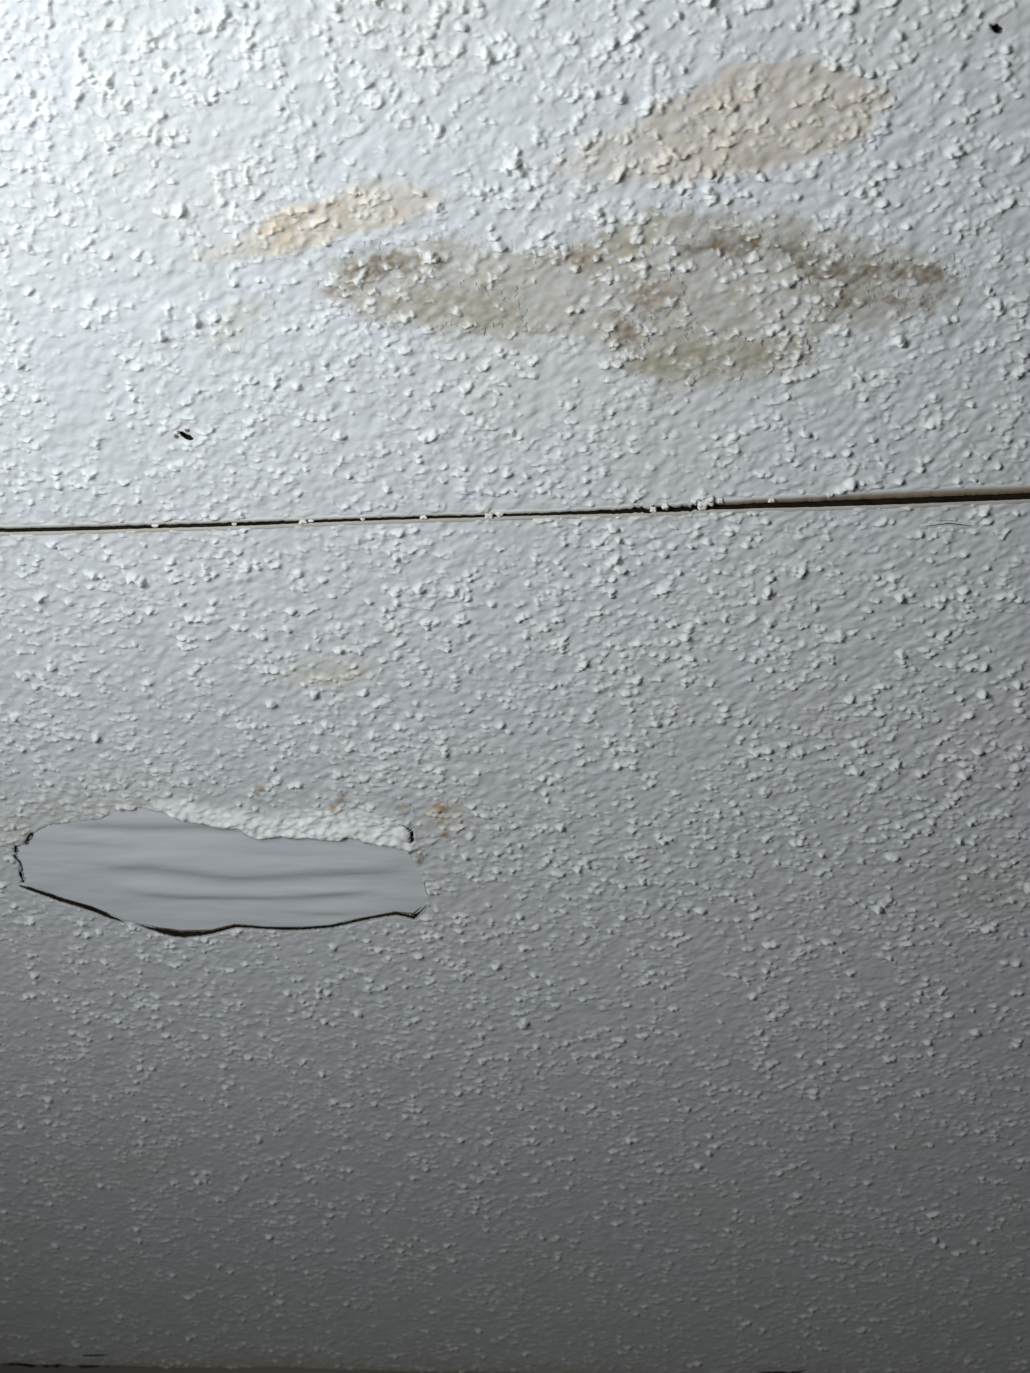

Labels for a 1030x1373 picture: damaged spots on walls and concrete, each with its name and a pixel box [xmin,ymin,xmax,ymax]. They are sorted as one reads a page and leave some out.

leakage [192,50,996,412]
crack [0,484,1030,536]
spalling [13,800,428,939]